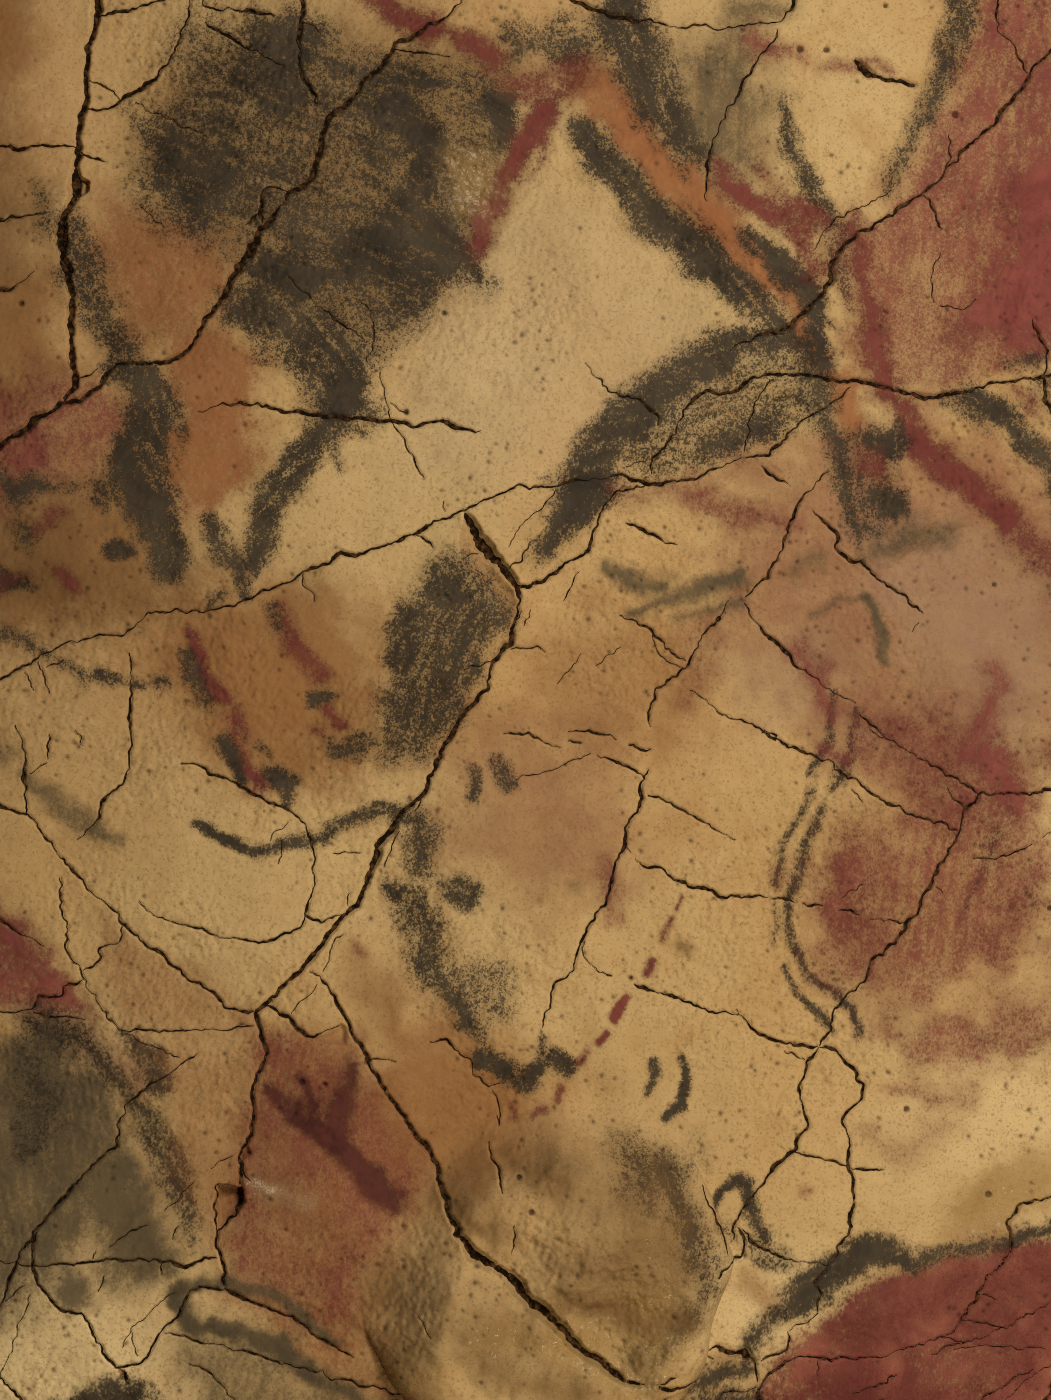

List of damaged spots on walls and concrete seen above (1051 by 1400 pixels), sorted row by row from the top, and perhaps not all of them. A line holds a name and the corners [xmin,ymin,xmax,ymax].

crack [0,0,462,449]
crack [198,276,481,480]
crack [570,0,795,201]
crack [730,0,1051,351]
crack [0,319,1051,1400]